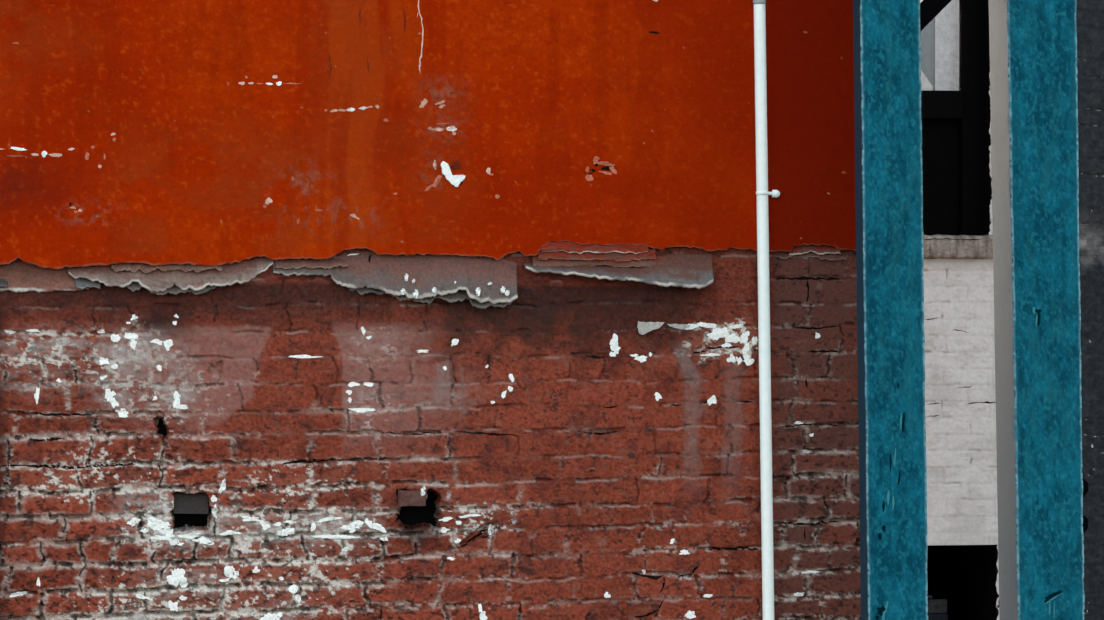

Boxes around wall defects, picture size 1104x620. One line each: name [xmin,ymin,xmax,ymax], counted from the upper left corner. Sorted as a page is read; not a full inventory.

peeling [0,146,106,168]
spalling [424,160,465,191]
flaking render [0,242,714,309]
peeling [97,314,173,351]
peeling [637,321,758,366]
peeling [99,357,129,418]
peeling [346,382,376,413]
peeling [126,478,296,546]
peeling [310,517,388,552]
spalling [396,486,494,543]
peeling [166,568,188,611]
peeling [219,566,239,582]